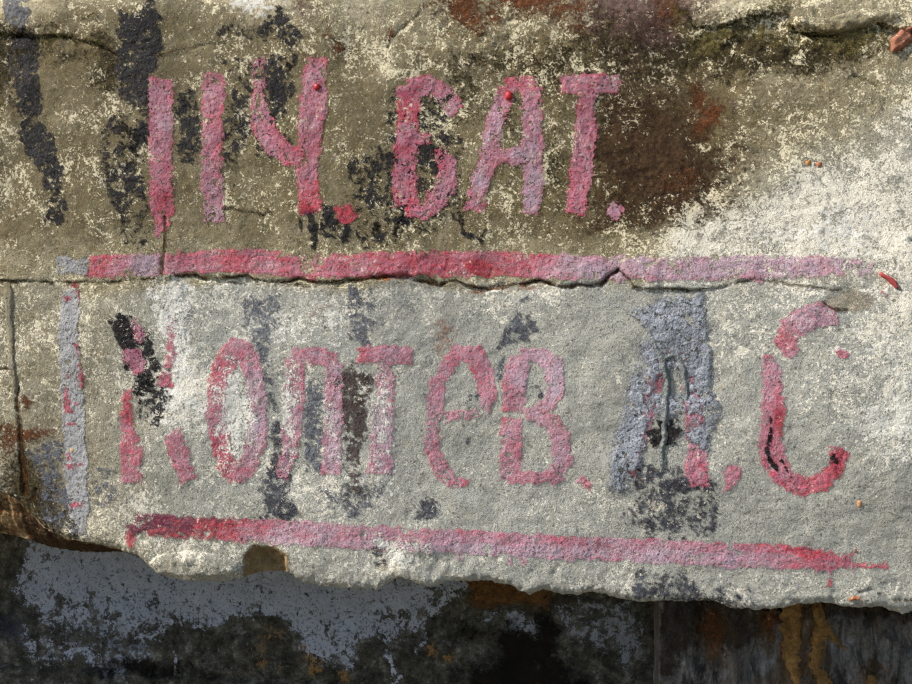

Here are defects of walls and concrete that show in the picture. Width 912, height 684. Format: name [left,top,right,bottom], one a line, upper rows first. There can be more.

corrosion [421,0,604,36]
crack [680,9,855,38]
crack [0,216,849,312]
crack [0,368,36,502]
peeling [0,492,471,684]